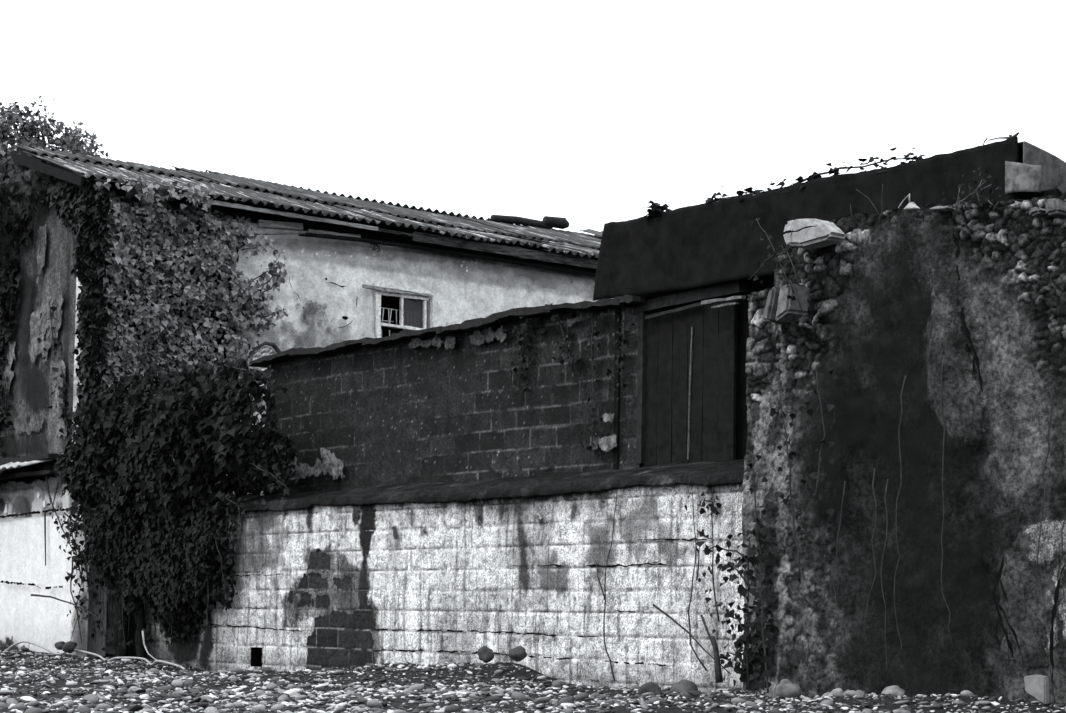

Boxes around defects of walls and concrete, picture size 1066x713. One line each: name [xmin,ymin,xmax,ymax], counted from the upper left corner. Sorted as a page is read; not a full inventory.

peeling [0,224,67,439]
water stain [254,295,373,351]
water stain [282,493,380,661]
water stain [441,479,601,593]
crack [993,556,1022,658]
crack [1049,554,1066,682]